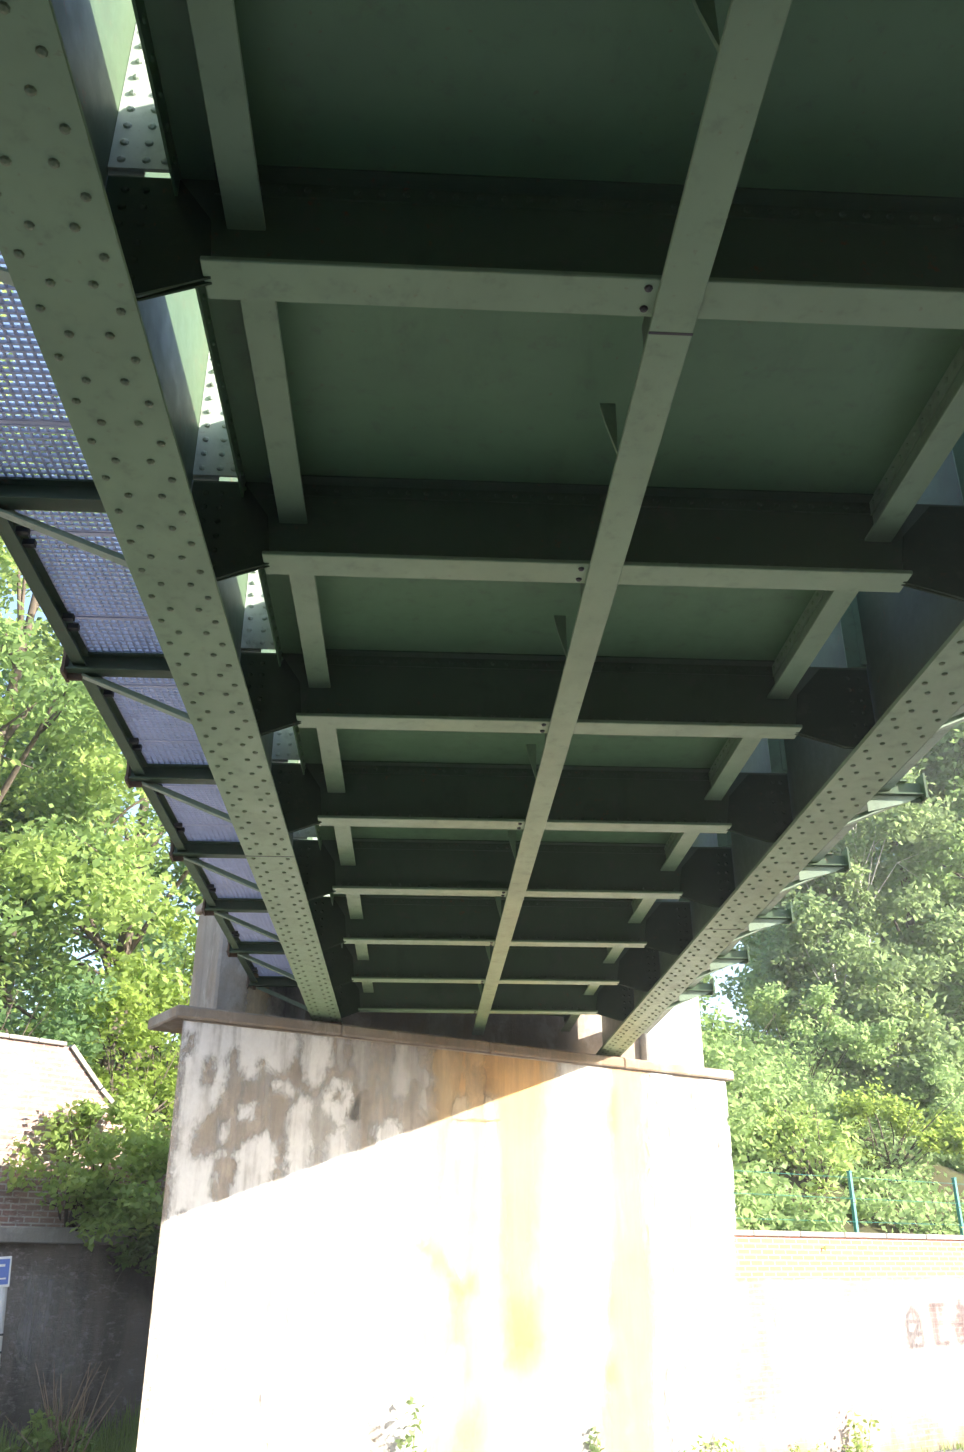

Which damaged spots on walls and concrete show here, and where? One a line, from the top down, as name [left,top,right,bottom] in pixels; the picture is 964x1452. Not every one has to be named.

corrosion [417,1050,559,1452]
corrosion [606,1069,653,1452]